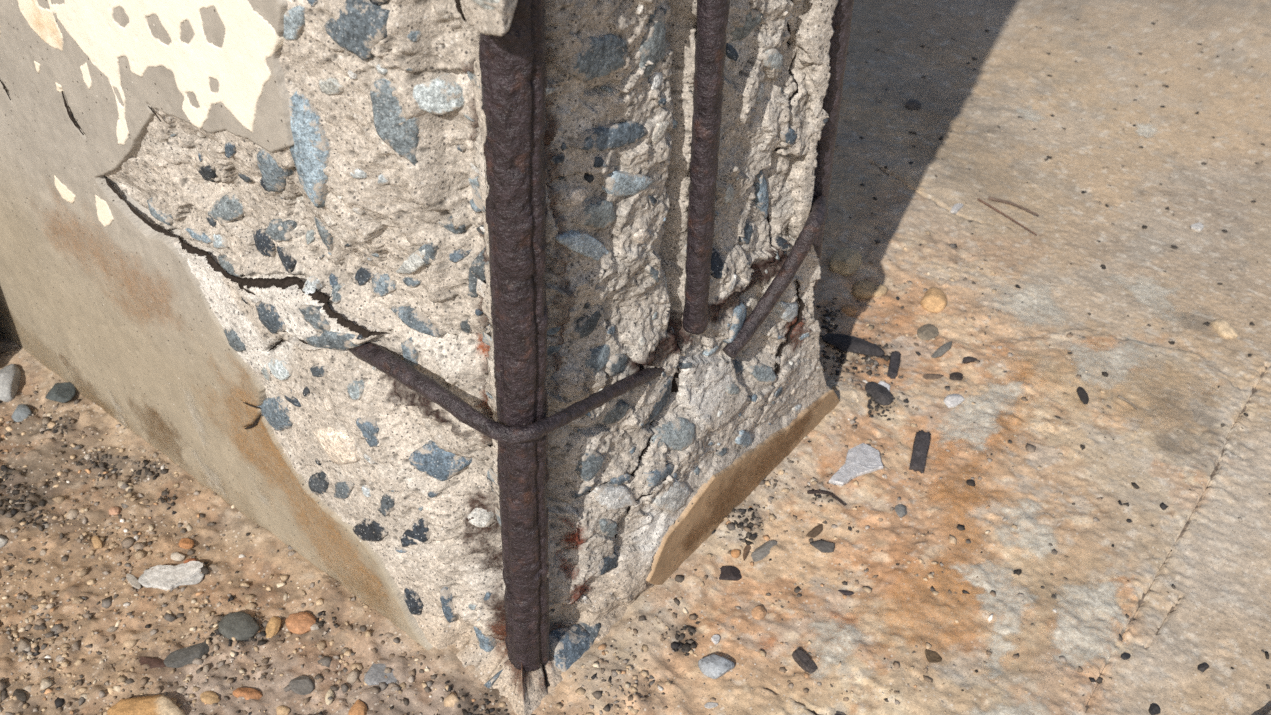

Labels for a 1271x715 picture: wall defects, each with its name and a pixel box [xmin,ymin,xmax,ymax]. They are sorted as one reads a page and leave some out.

corrosion [543,104,562,234]
crack [105,178,387,338]
corrosion [708,242,789,324]
crack [268,339,311,352]
spalling [17,0,854,715]
corrosion [626,312,693,373]
corrosion [786,318,808,350]
corrosion [387,375,455,431]
peeling [829,443,883,486]
corrosion [462,494,502,569]
corrosion [560,528,585,573]
corrosion [491,594,507,654]